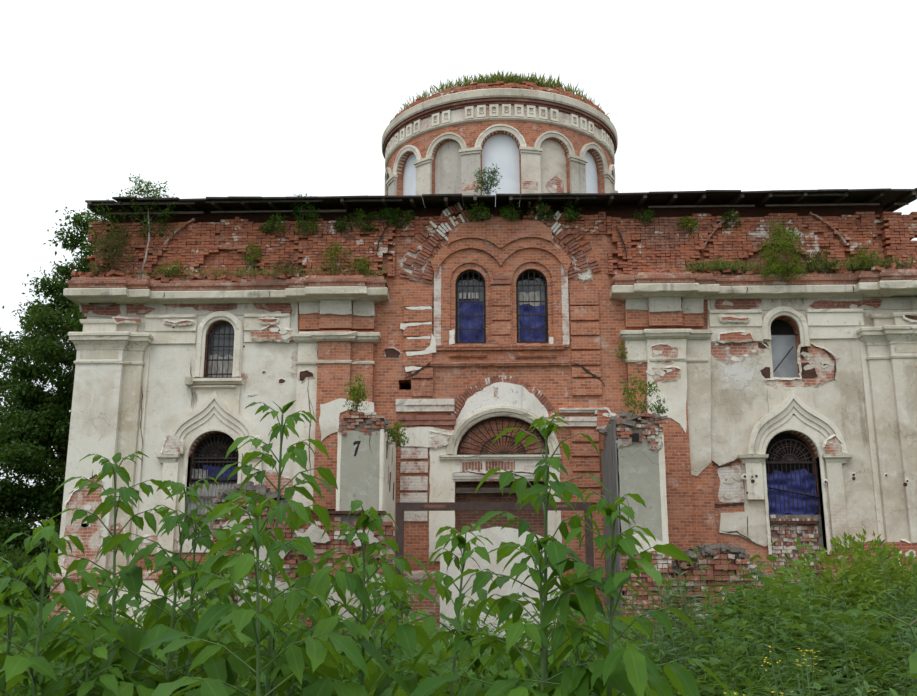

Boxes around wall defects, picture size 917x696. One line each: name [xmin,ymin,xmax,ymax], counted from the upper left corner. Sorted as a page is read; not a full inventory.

peeling [243,303,315,386]
peeling [646,343,682,383]
peeling [711,299,770,365]
peeling [760,341,837,390]
peeling [717,465,759,503]
peeling [62,472,126,570]